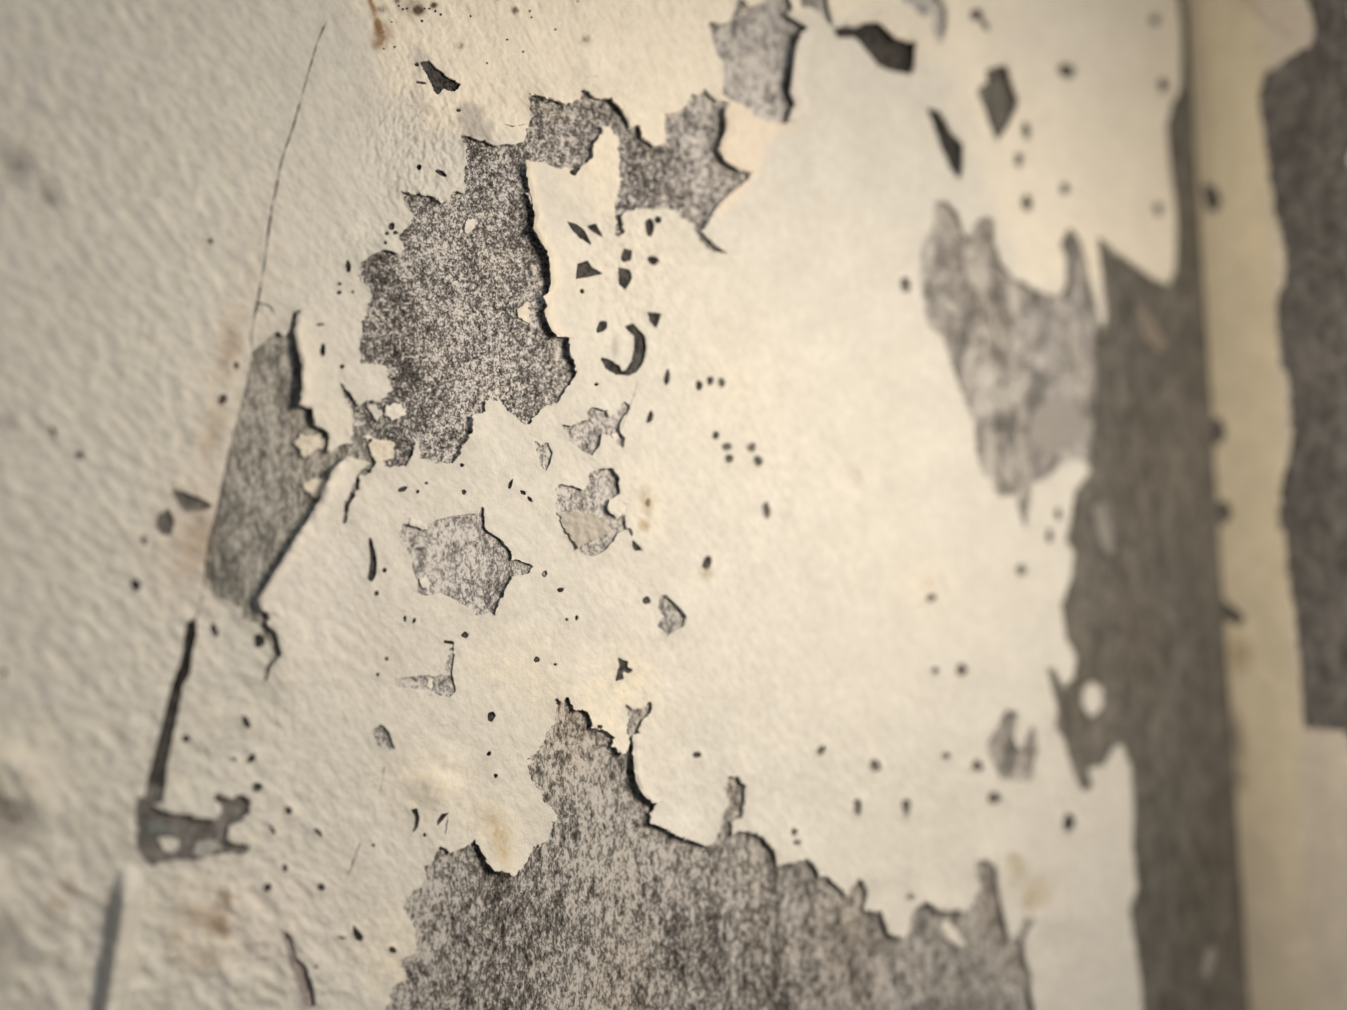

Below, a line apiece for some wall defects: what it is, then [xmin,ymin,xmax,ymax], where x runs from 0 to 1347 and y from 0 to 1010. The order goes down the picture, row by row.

peeling [134,783,263,867]
spalling [338,925,363,941]
peeling [204,0,824,682]
peeling [386,697,1034,1010]
peeling [900,0,1250,1010]
peeling [1258,0,1347,736]